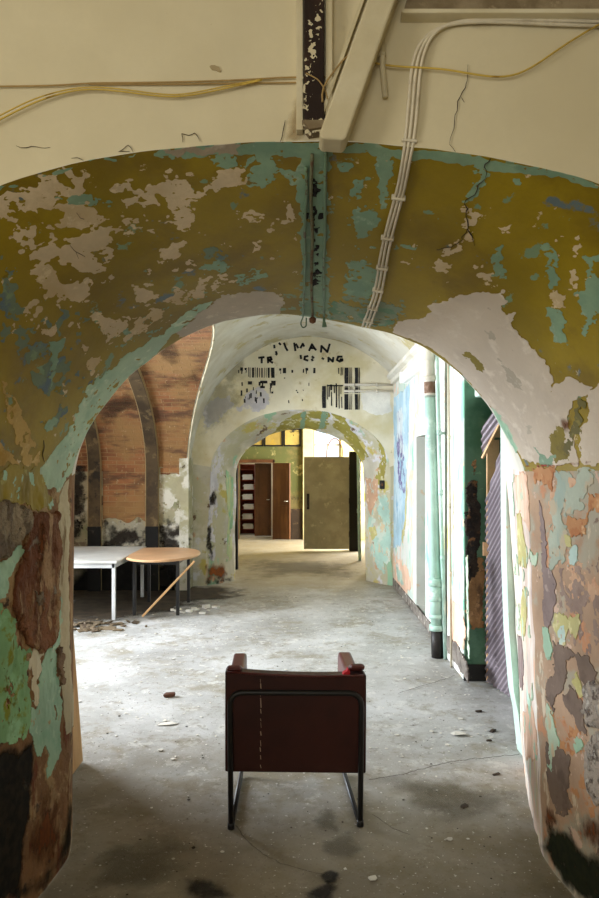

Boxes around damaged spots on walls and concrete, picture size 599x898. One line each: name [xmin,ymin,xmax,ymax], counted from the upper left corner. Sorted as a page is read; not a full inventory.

crack [449,69,468,152]
crack [437,158,491,250]
spalling [0,0,325,779]
water stain [74,465,87,538]
water stain [103,520,145,546]
water stain [159,519,191,548]
peeling [270,411,411,593]
spalling [325,150,599,818]